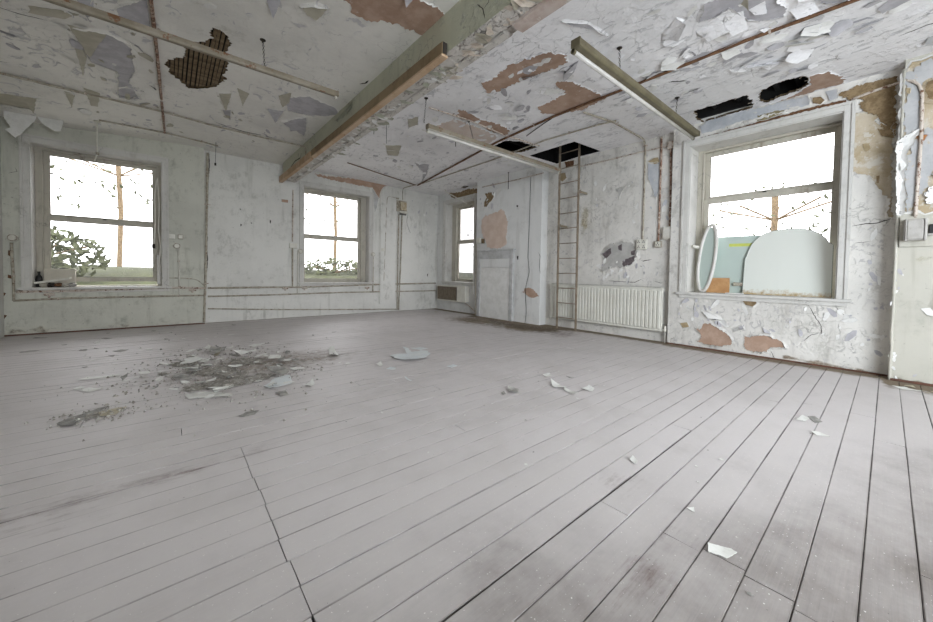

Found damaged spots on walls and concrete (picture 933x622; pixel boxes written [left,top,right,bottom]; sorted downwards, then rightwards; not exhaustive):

peeling [28,0,165,115]
flaking render [343,0,445,36]
peeling [560,19,613,55]
peeling [0,91,42,114]
peeling [215,88,249,131]
peeling [252,93,355,142]
peeling [297,90,437,198]
flaking render [444,46,608,165]
flaking render [443,156,519,249]
peeling [595,238,658,284]
flaking render [678,298,789,355]
peeling [811,269,904,379]